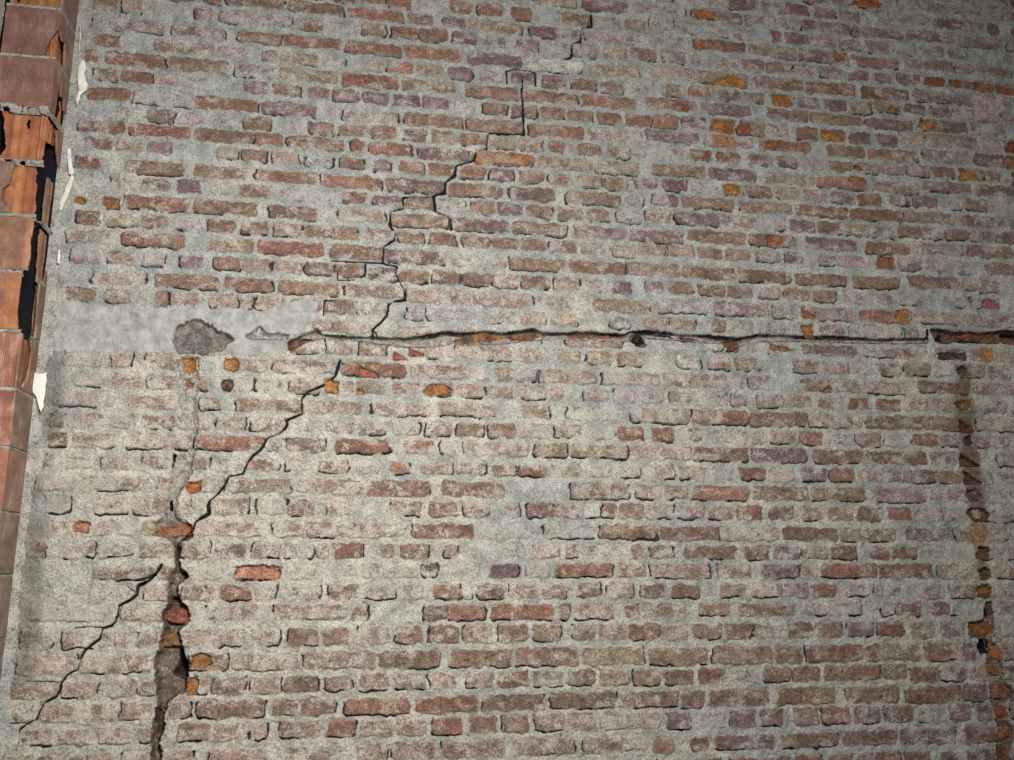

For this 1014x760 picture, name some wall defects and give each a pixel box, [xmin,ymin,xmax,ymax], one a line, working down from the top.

peeling [76,26,88,105]
crack [323,14,593,340]
flaking render [173,319,239,392]
flaking render [246,327,315,350]
crack [9,360,341,751]